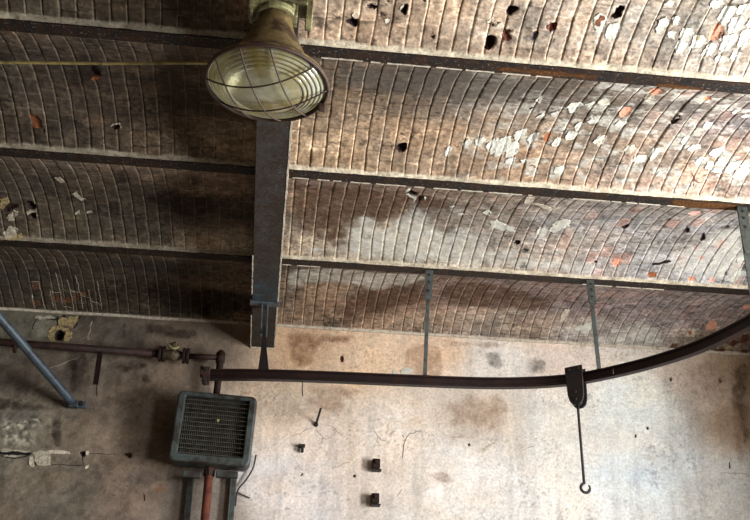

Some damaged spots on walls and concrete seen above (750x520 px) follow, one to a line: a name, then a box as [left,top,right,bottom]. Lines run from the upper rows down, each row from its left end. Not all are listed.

spalling [484,5,519,50]
spalling [530,22,557,41]
peeling [594,5,625,42]
peeling [655,0,750,63]
peeling [567,98,610,113]
peeling [445,118,599,165]
peeling [624,144,661,164]
peeling [681,135,750,181]
peeling [0,196,37,241]
water stain [295,185,569,269]
peeling [482,210,528,268]
water stain [289,269,424,319]